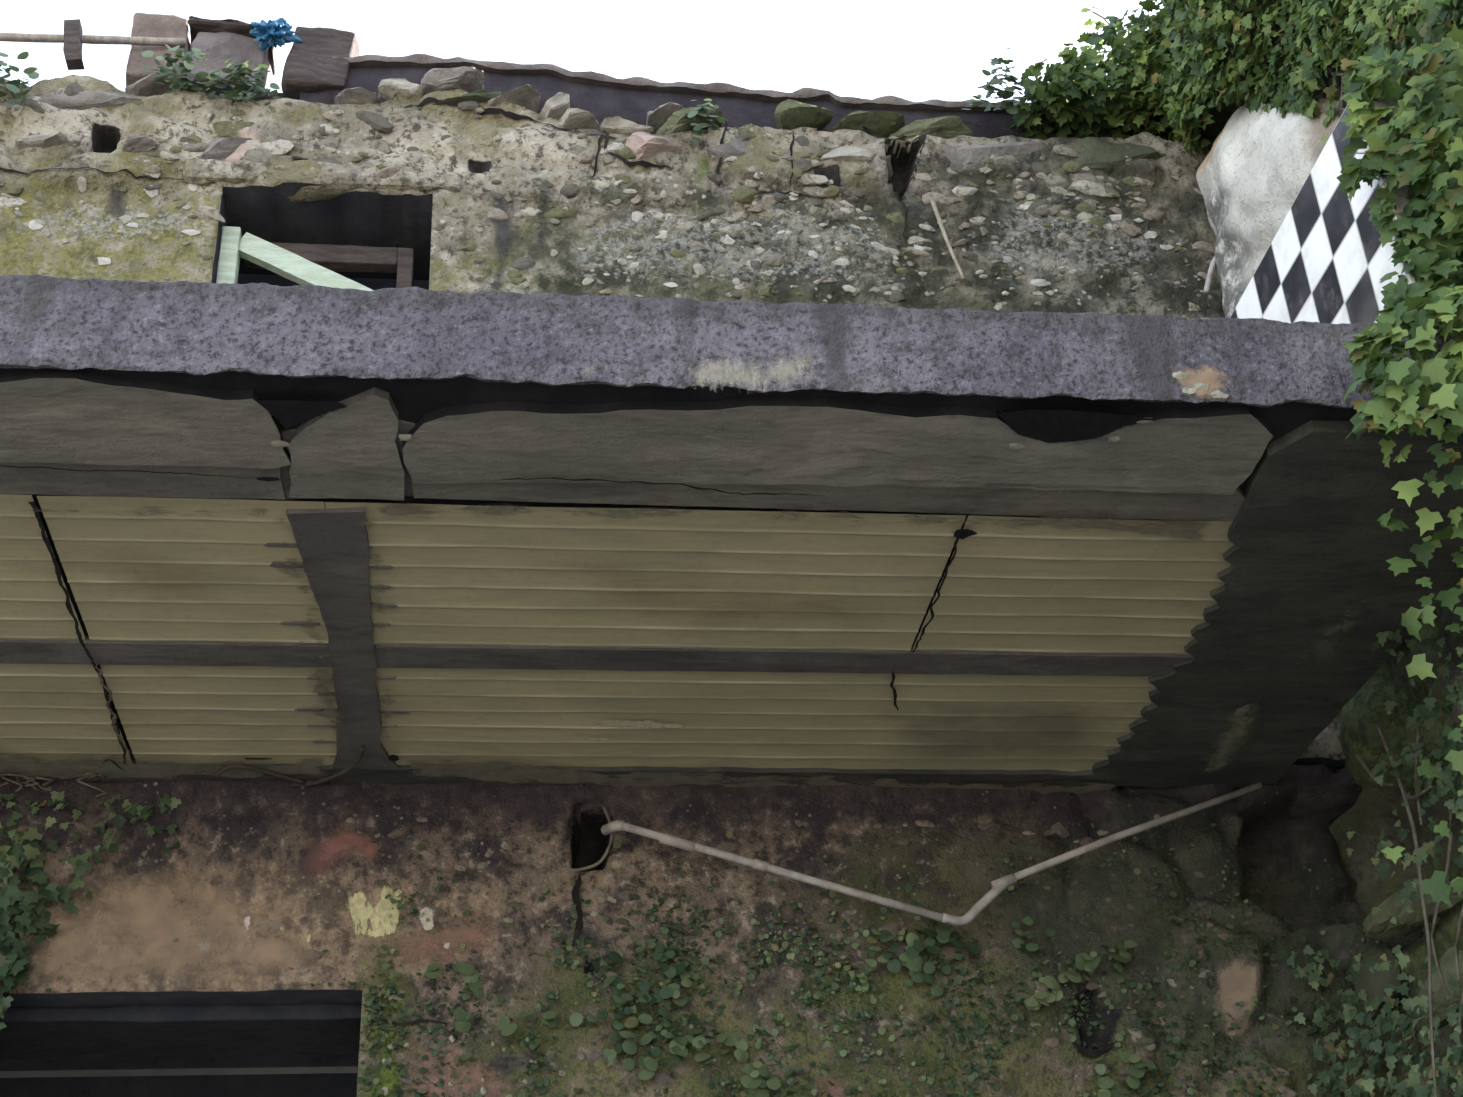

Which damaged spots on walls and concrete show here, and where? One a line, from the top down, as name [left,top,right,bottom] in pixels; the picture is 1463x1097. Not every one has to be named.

crack [0,465,287,772]
crack [890,537,959,711]